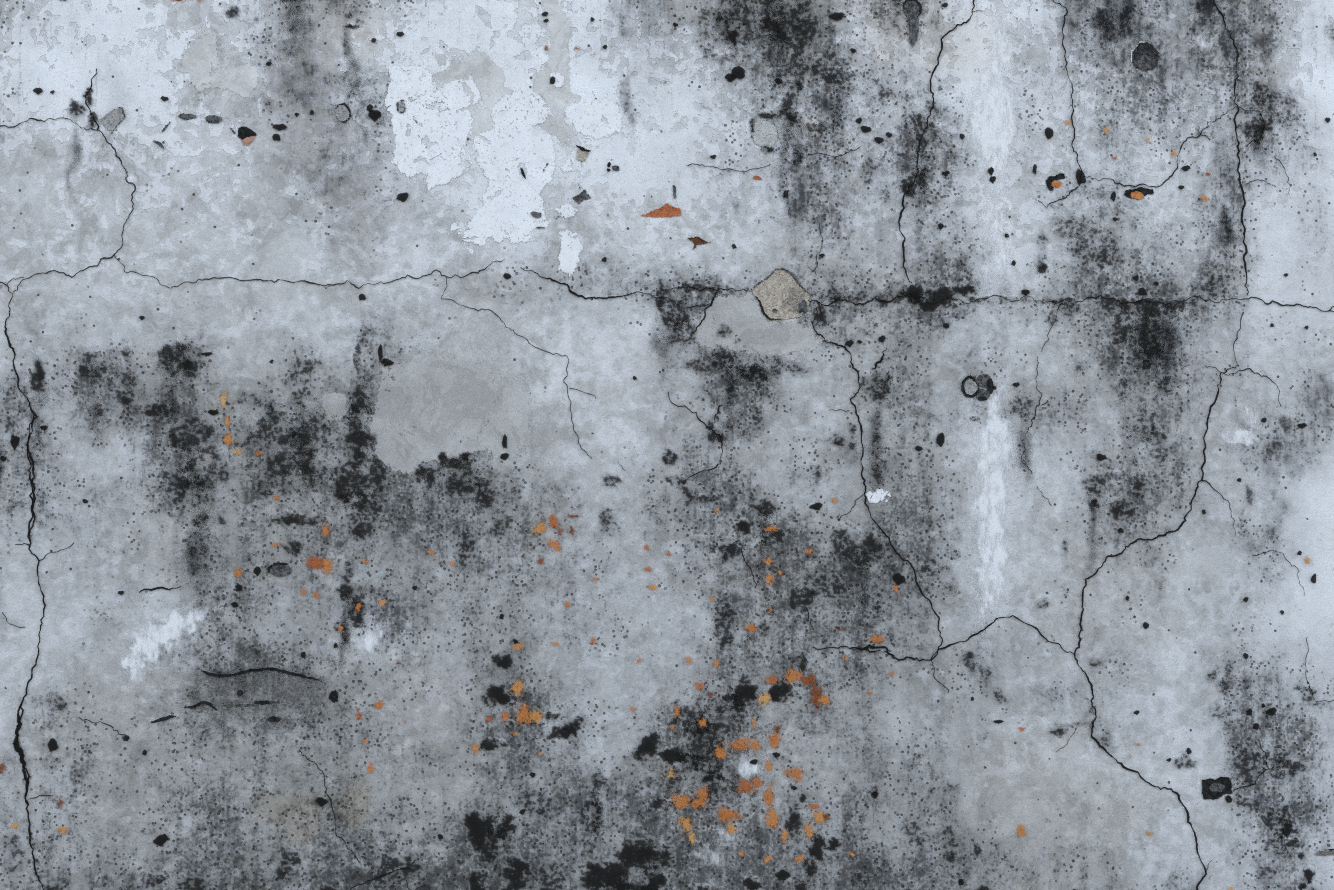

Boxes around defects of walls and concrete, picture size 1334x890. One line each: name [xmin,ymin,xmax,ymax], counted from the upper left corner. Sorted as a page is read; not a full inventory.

spalling [153,110,314,149]
peeling [367,0,623,276]
crack [688,163,770,172]
peeling [687,268,822,358]
water stain [78,338,387,567]
crack [0,68,748,890]
crack [805,0,1334,890]
rust [486,680,543,736]
water stain [462,790,675,890]
rust [670,786,742,844]
water stain [632,652,810,811]
rust [715,669,831,843]